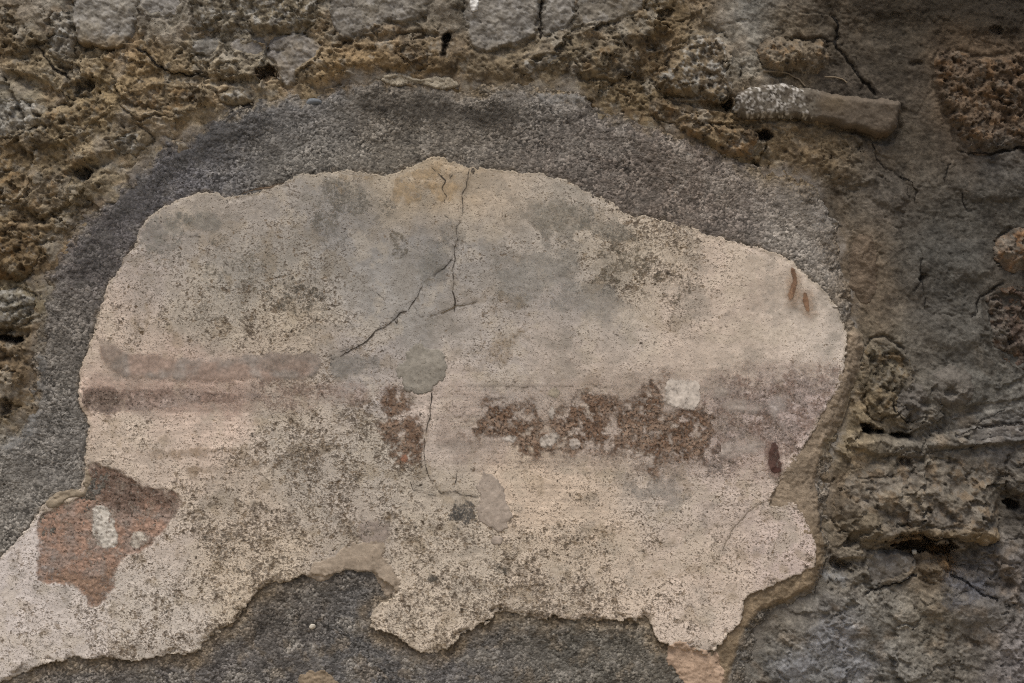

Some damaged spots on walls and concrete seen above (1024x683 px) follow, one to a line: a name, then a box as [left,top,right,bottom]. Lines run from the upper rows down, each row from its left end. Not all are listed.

crack [821,16,876,95]
spalling [755,129,772,141]
crack [328,171,475,360]
spalling [0,336,23,344]
peeling [82,344,320,414]
spalling [378,386,423,465]
crack [410,393,473,497]
spalling [473,369,838,479]
peeling [36,464,179,606]